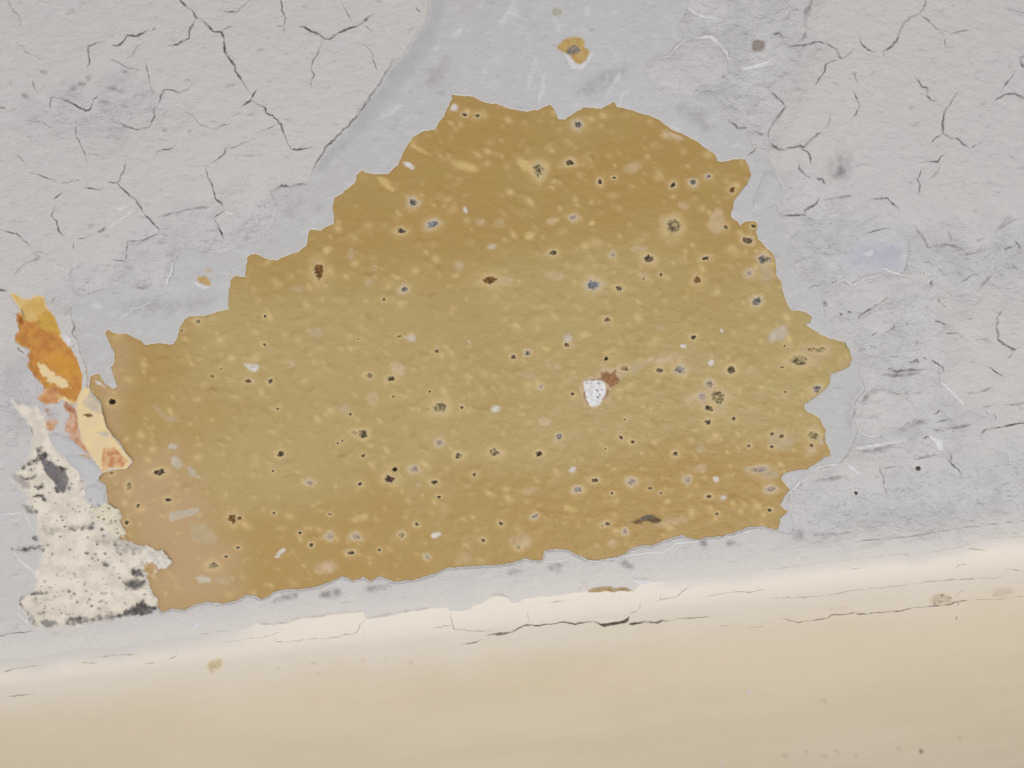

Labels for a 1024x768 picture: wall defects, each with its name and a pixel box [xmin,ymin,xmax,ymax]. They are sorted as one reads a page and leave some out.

crack [17,124,235,262]
crack [87,28,177,130]
crack [174,0,386,164]
crack [729,93,849,216]
crack [774,3,899,115]
crack [917,80,975,192]
corrosion [10,293,90,459]
peeling [11,0,865,628]
crack [854,357,940,415]
crack [912,329,1024,472]
damp [19,447,157,628]
crack [201,588,759,645]